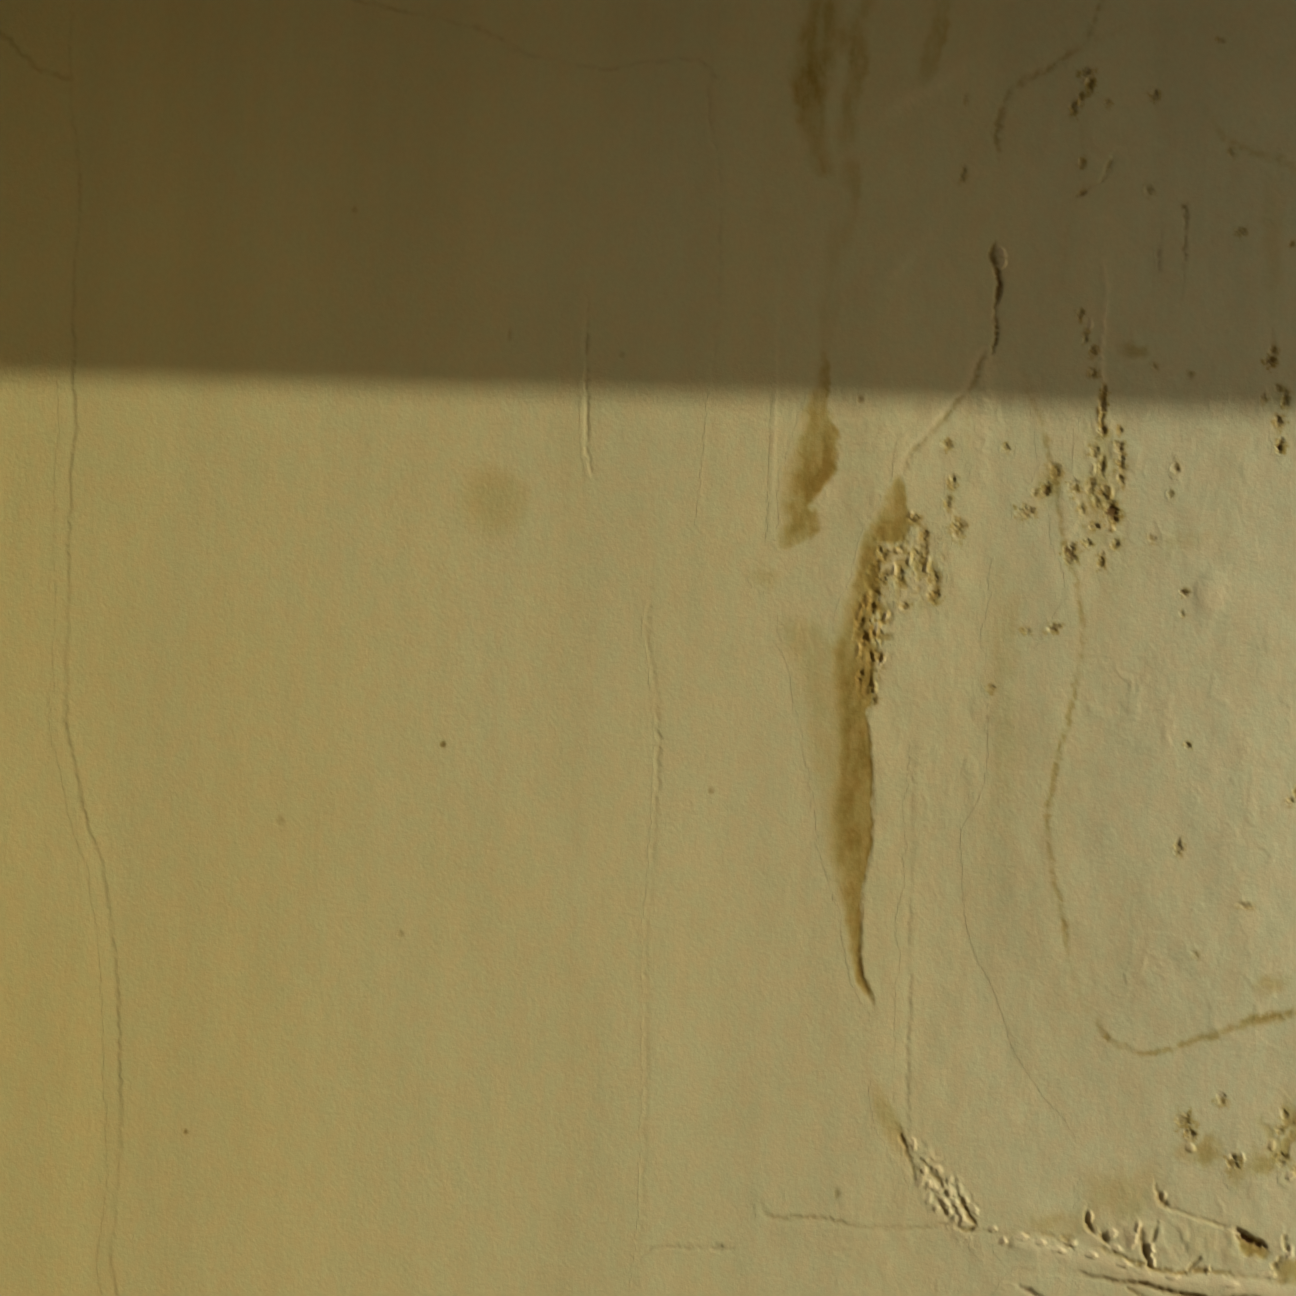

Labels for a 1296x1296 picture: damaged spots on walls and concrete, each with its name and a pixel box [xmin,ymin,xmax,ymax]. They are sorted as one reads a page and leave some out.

leakage [743,0,879,594]
spalling [1009,257,1161,608]
spalling [1258,311,1296,461]
peeling [777,434,973,1018]
spalling [1017,620,1070,639]
peeling [886,1085,1296,1289]